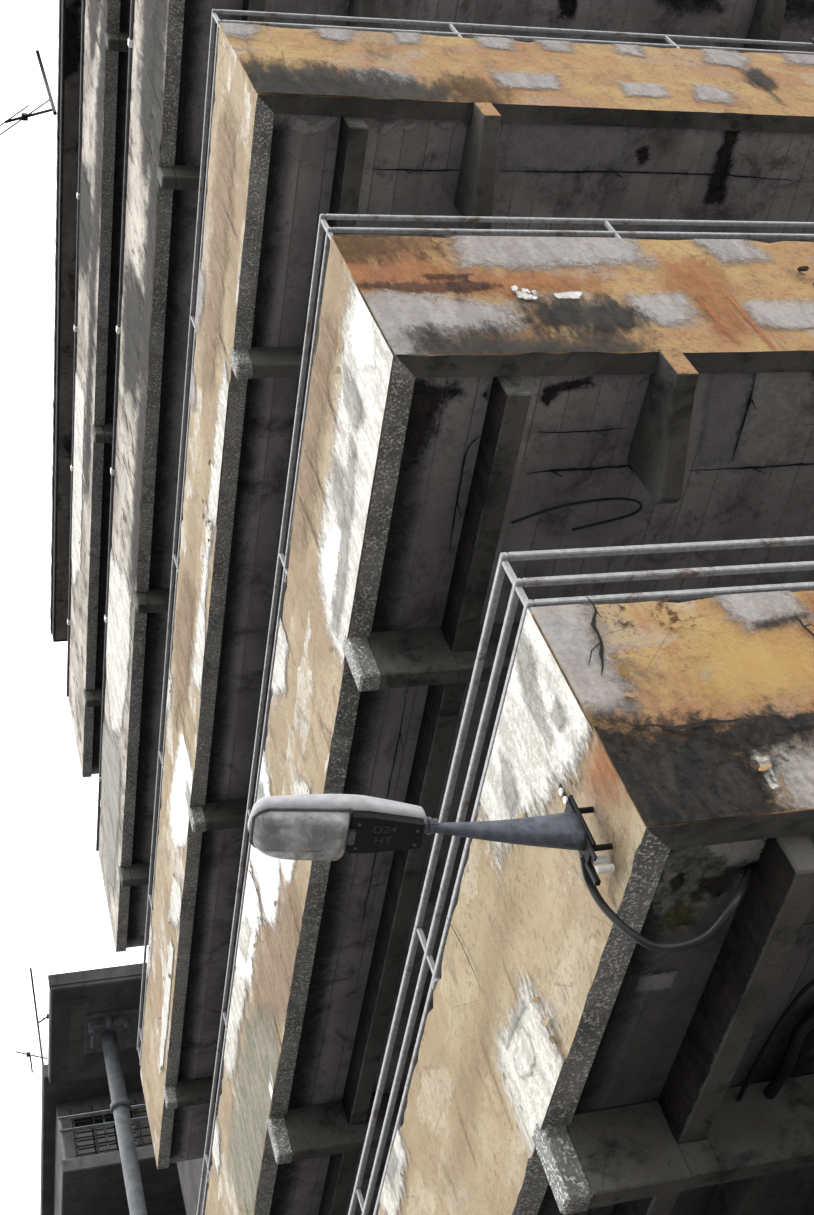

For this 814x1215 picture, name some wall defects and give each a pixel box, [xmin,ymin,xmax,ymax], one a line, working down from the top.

damp [528,0,577,18]
rust [744,67,782,102]
damp [704,131,742,205]
rust [332,234,602,297]
crack [689,374,814,474]
crack [586,596,604,675]
rust [647,599,695,629]
peeling [257,751,272,801]
peeling [293,776,311,795]
damp [593,697,814,827]
peeling [223,845,295,1085]
peeling [494,975,564,1158]